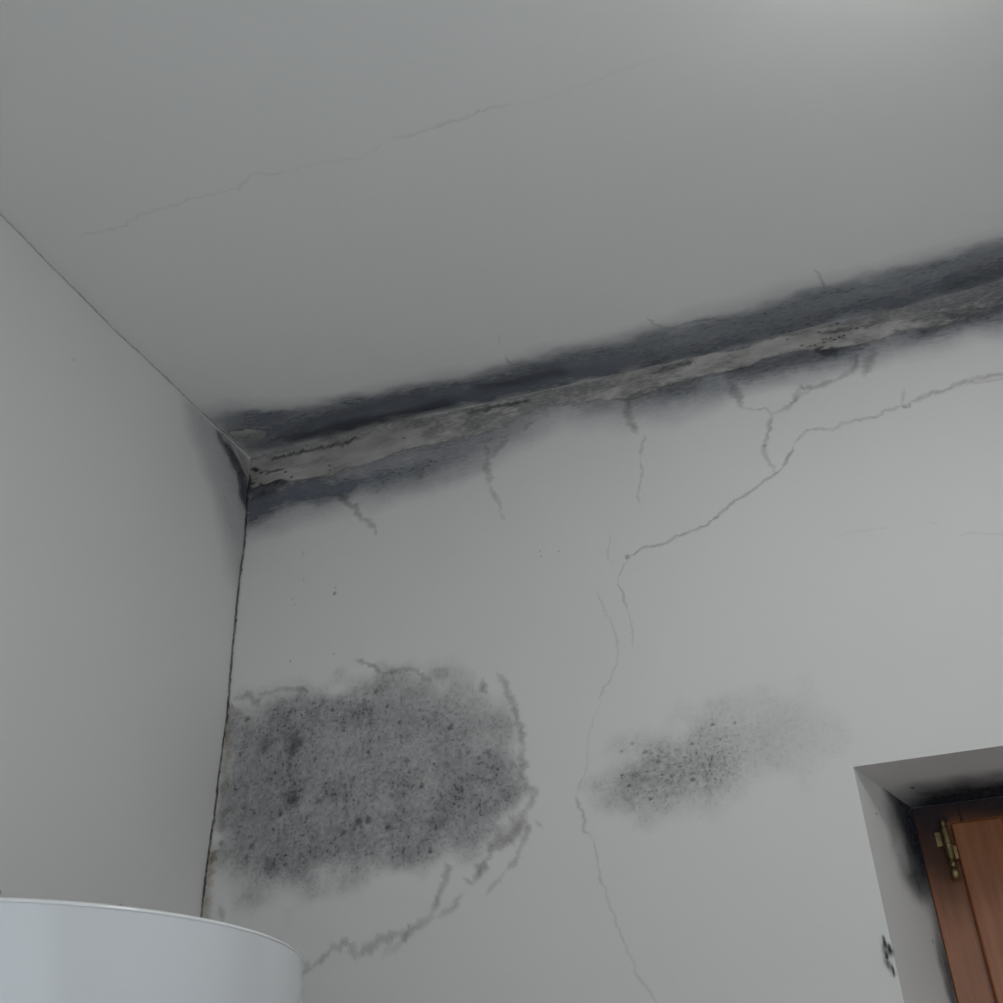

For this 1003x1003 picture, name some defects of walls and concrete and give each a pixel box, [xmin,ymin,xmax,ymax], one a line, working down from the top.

leakage [218,246,1003,527]
leakage [226,697,516,873]
leakage [889,780,1003,894]